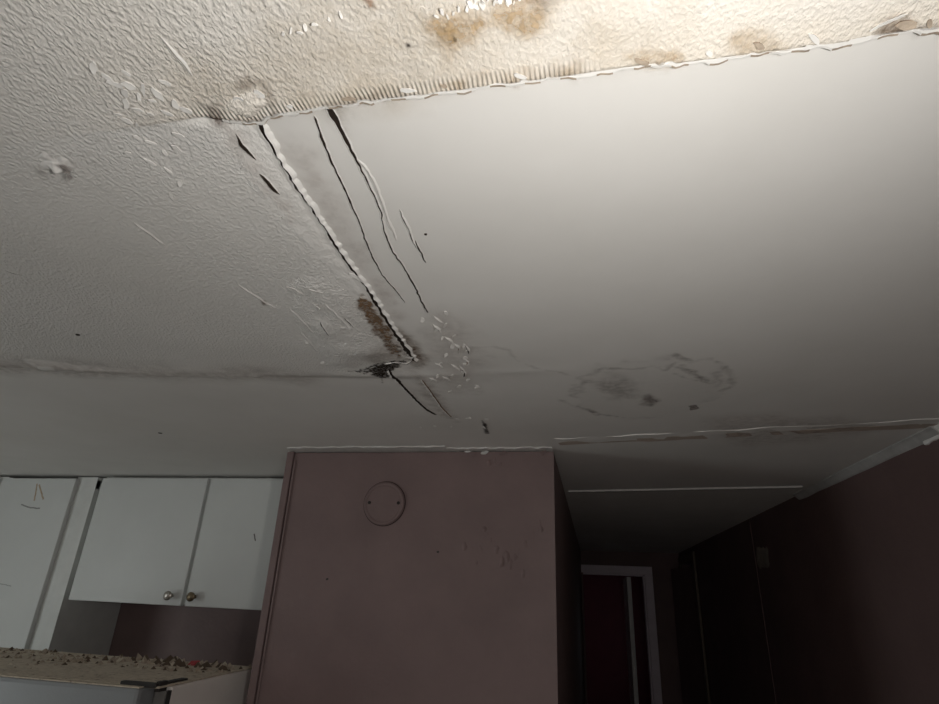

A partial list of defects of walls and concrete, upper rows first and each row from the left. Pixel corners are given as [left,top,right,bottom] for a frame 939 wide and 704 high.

peeling [434,0,521,20]
damp [433,19,483,44]
crack [256,109,453,417]